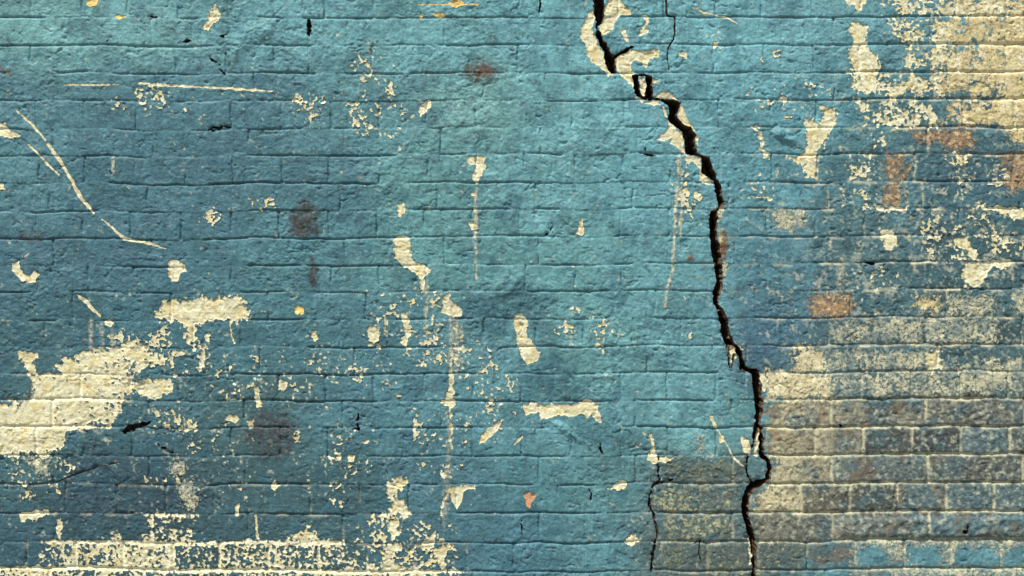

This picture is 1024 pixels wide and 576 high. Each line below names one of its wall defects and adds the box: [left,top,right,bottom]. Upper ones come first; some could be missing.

flaking render [845,0,1024,213]
peeling [393,235,431,293]
crack [593,0,772,576]
peeling [880,228,899,250]
peeling [971,203,1024,221]
peeling [154,294,252,372]
peeling [513,312,541,364]
peeling [0,339,174,481]
peeling [224,386,262,429]
peeling [522,399,602,423]
flaking render [624,237,1024,576]
peeling [0,443,462,576]